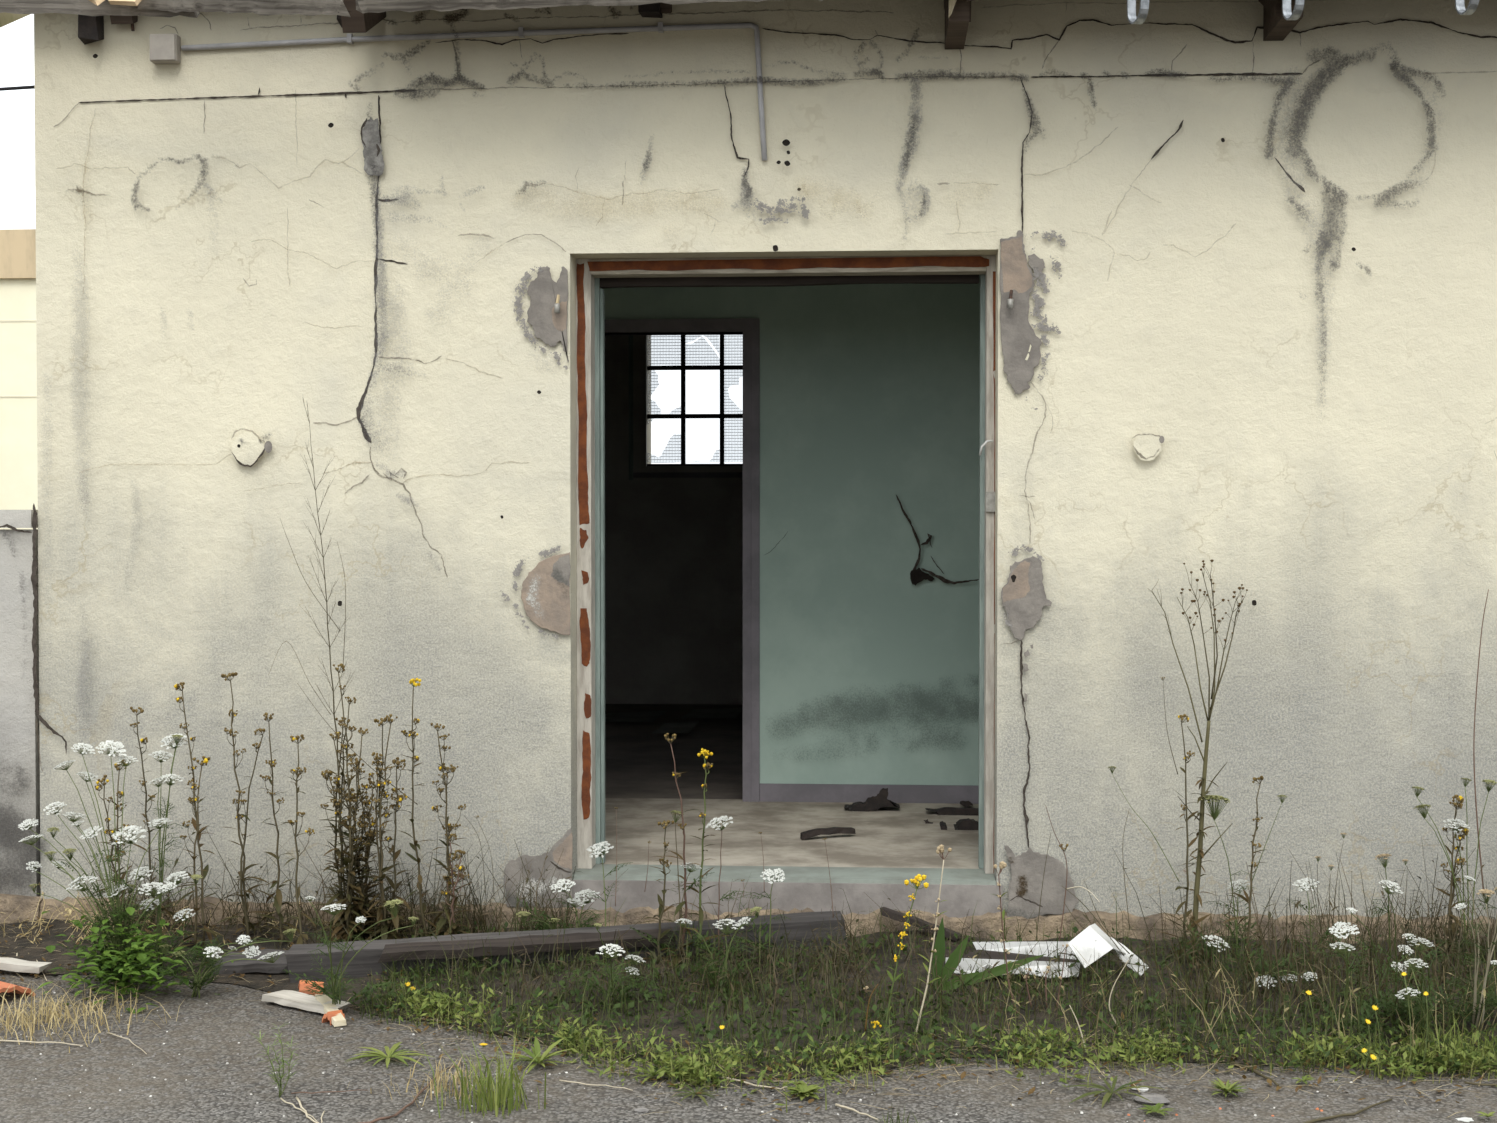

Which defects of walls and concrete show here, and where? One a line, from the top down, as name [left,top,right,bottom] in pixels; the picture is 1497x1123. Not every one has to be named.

damp [131,155,211,211]
crack [54,9,1497,586]
damp [1051,69,1186,106]
damp [1211,47,1441,379]
spalling [500,230,1067,667]
spalling [994,512,1052,745]
damp [0,768,45,890]
crack [1012,640,1030,848]
spalling [993,827,1079,919]